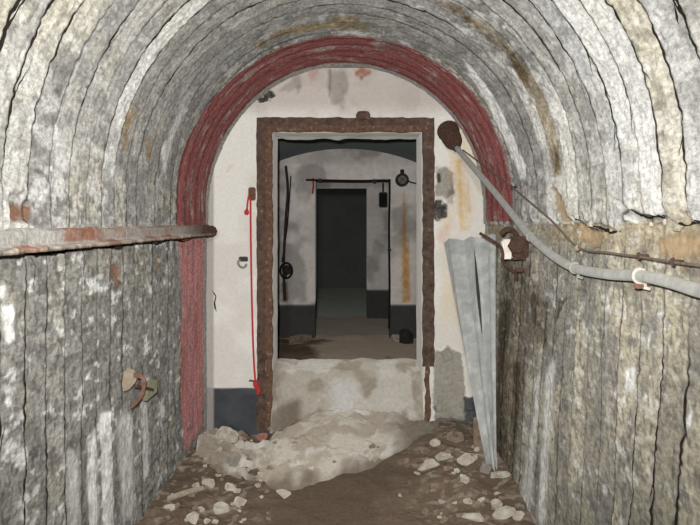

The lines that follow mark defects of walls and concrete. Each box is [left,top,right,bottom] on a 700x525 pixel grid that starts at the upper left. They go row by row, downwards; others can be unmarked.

crack [672,0,700,59]
crack [604,0,662,192]
crack [637,0,687,199]
flaking render [434,168,454,221]
spalling [552,186,603,246]
crack [630,209,700,232]
flaking render [434,347,476,423]
crack [611,338,664,525]
crack [674,351,690,525]